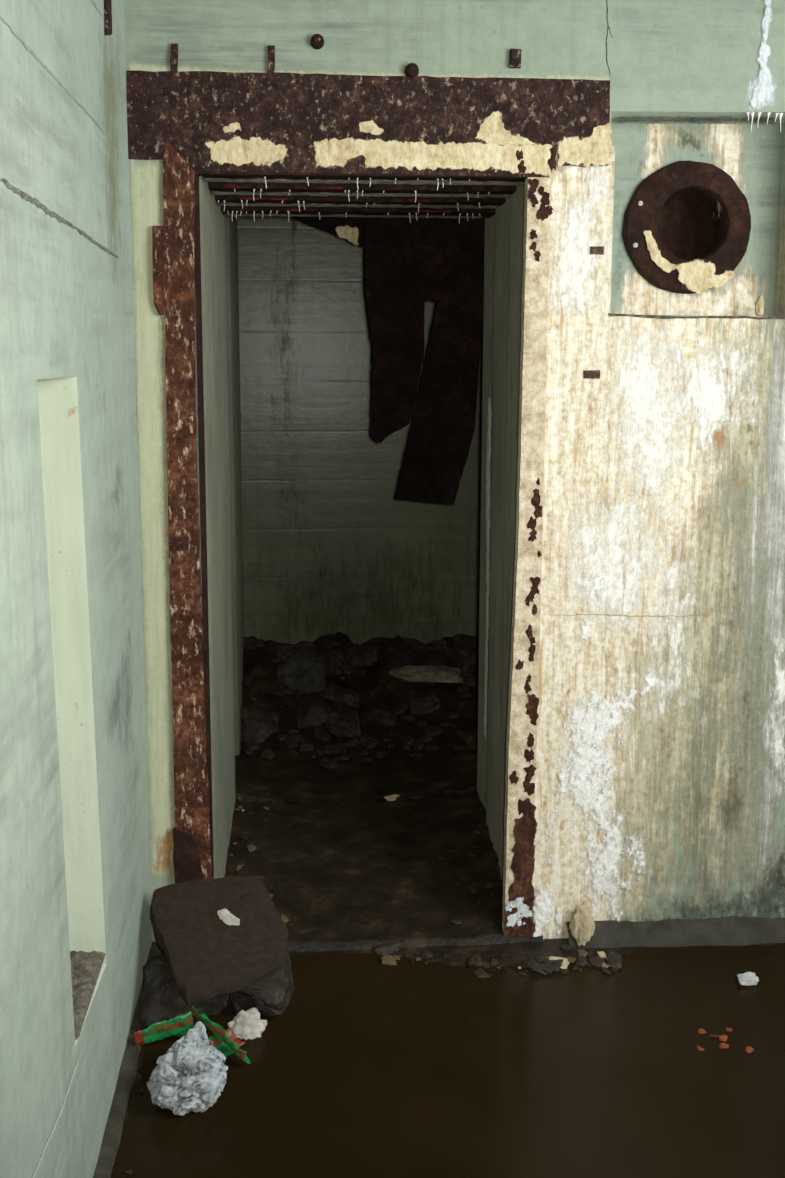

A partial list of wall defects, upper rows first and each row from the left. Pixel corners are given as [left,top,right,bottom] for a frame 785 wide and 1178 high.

peeling [205,122,288,166]
peeling [314,111,613,177]
rust [547,147,556,171]
leakage [616,117,779,190]
crack [2,178,119,258]
rust [516,150,553,262]
rust [527,478,542,557]
leakage [505,148,785,939]
rust [503,577,540,938]
rust [157,828,173,873]